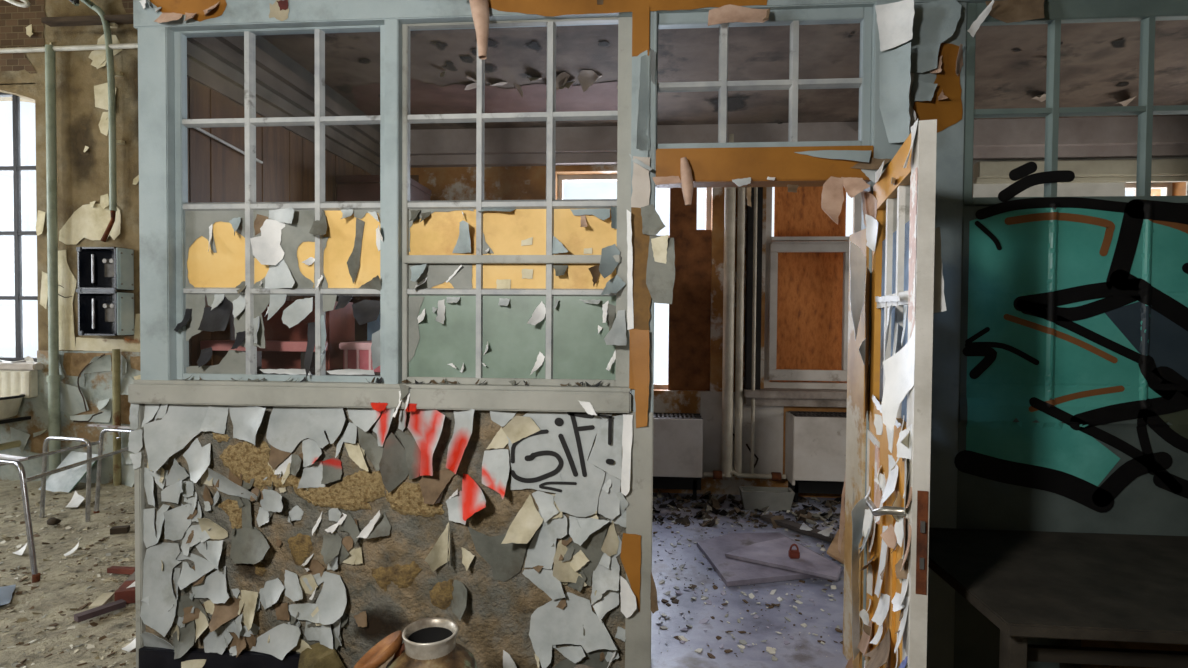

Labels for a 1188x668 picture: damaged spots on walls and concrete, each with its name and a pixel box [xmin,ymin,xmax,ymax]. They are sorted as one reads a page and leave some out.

peeling [139,0,227,23]
spalling [269,0,289,21]
peeling [89,34,123,69]
peeling [410,0,770,125]
peeling [732,177,751,207]
peeling [36,210,46,236]
peeling [795,0,1045,668]
peeling [40,48,694,668]